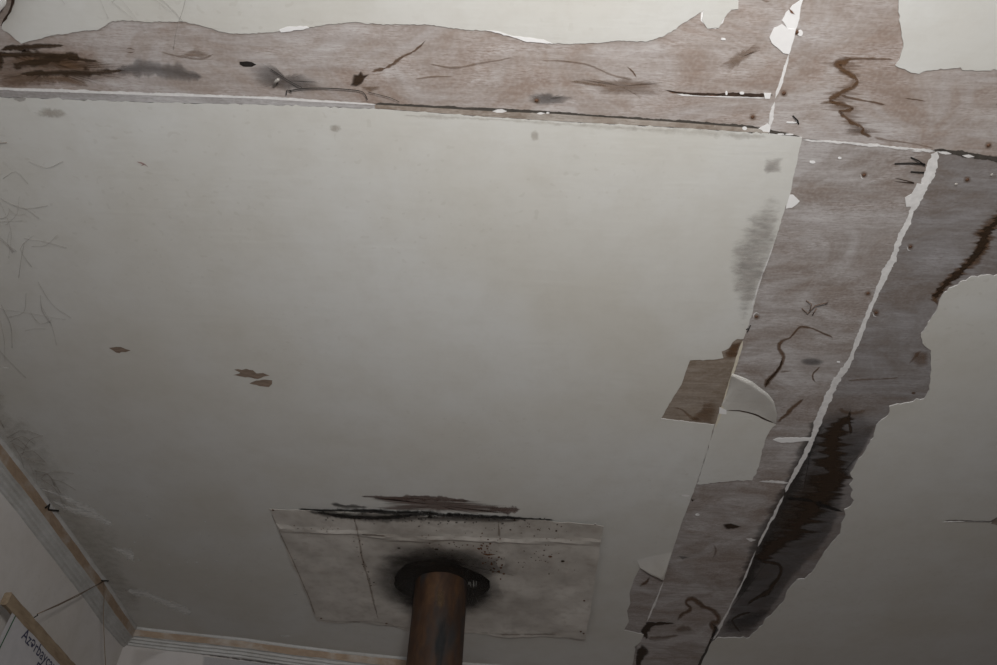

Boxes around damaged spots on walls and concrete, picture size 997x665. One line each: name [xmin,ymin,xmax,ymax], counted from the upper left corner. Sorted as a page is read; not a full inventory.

water stain [0,44,122,76]
peeling [0,0,803,132]
peeling [624,0,997,665]
water stain [333,495,468,508]
water stain [636,413,853,665]